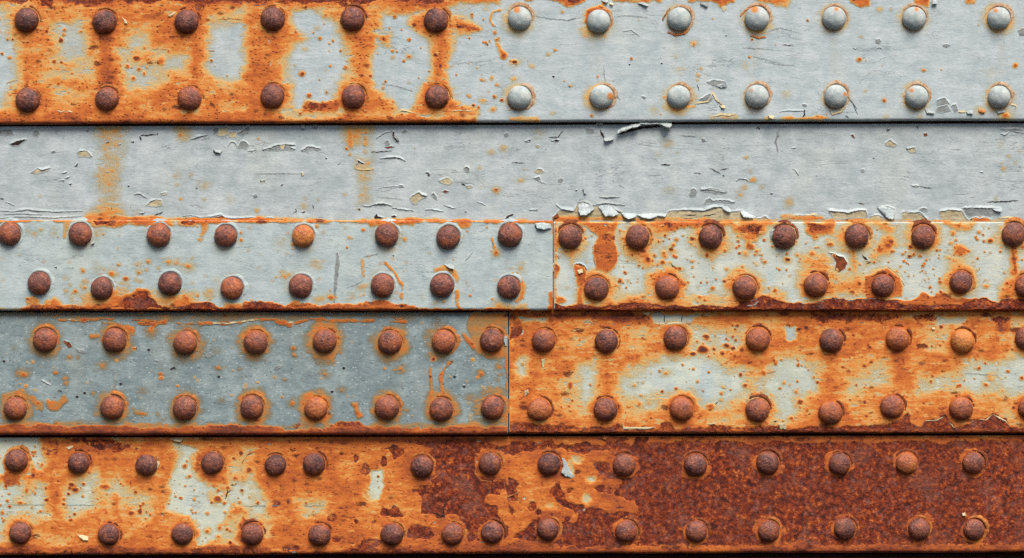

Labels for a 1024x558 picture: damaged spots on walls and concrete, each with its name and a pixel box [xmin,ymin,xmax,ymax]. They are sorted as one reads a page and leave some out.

corrosion [552,0,735,39]
corrosion [741,0,791,41]
corrosion [806,0,930,32]
corrosion [0,0,533,192]
peeling [0,127,41,148]
peeling [211,125,328,159]
peeling [585,122,672,141]
peeling [30,148,94,186]
peeling [398,165,473,206]
peeling [528,186,770,231]
peeling [786,205,1003,222]
corrosion [0,195,1024,556]